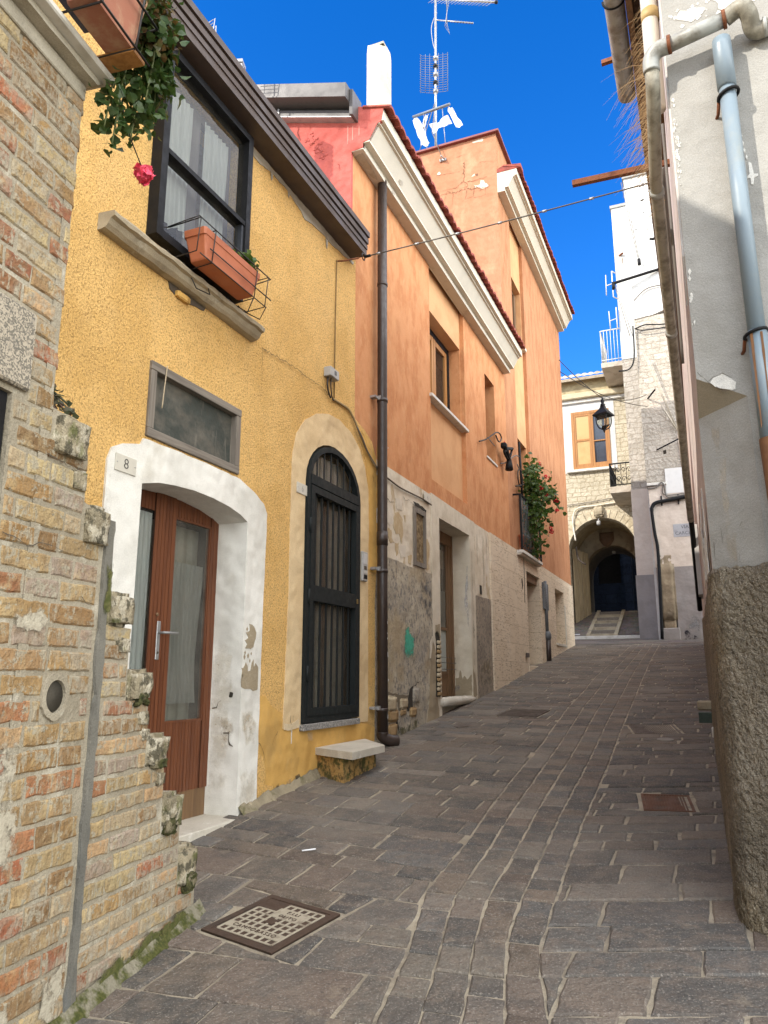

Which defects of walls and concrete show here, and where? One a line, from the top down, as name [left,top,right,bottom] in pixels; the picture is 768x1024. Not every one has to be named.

peeling [668,0,735,28]
crack [437,155,486,199]
flaking render [708,373,736,391]
peeling [212,624,258,709]